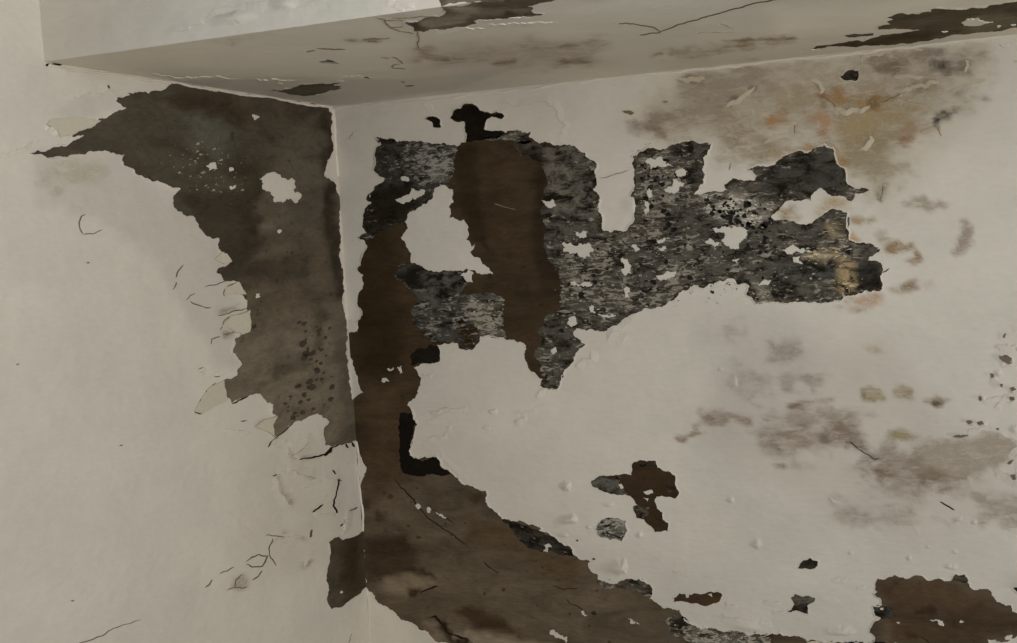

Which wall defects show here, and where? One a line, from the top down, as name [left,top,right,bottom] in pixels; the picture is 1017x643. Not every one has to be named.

crack [307,16,436,87]
peeling [403,0,559,34]
crack [619,0,774,36]
peeling [805,1,1017,82]
peeling [271,80,345,97]
leakage [825,49,963,169]
peeling [27,84,363,448]
peeling [325,101,1017,643]
crack [300,442,358,537]
leakage [867,435,1015,491]
crack [206,535,284,590]
crack [80,620,139,643]